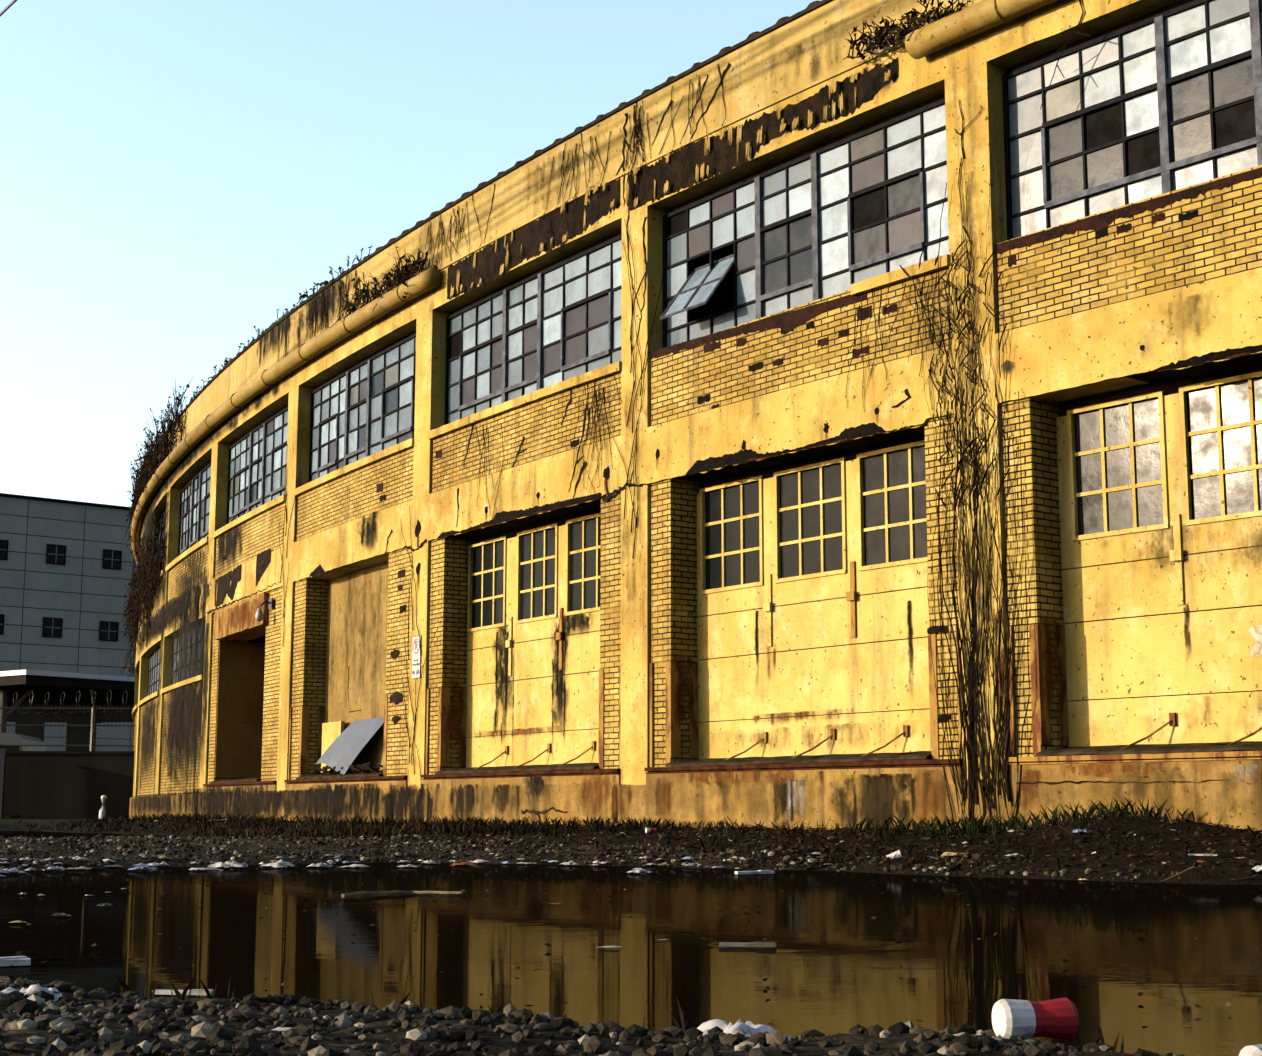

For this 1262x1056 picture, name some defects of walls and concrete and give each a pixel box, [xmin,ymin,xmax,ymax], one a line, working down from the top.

flaking render [447,57,898,300]
water stain [131,380,478,822]
water stain [493,625,514,736]
water stain [551,613,589,732]
water stain [492,776,546,810]
rust [582,773,630,815]